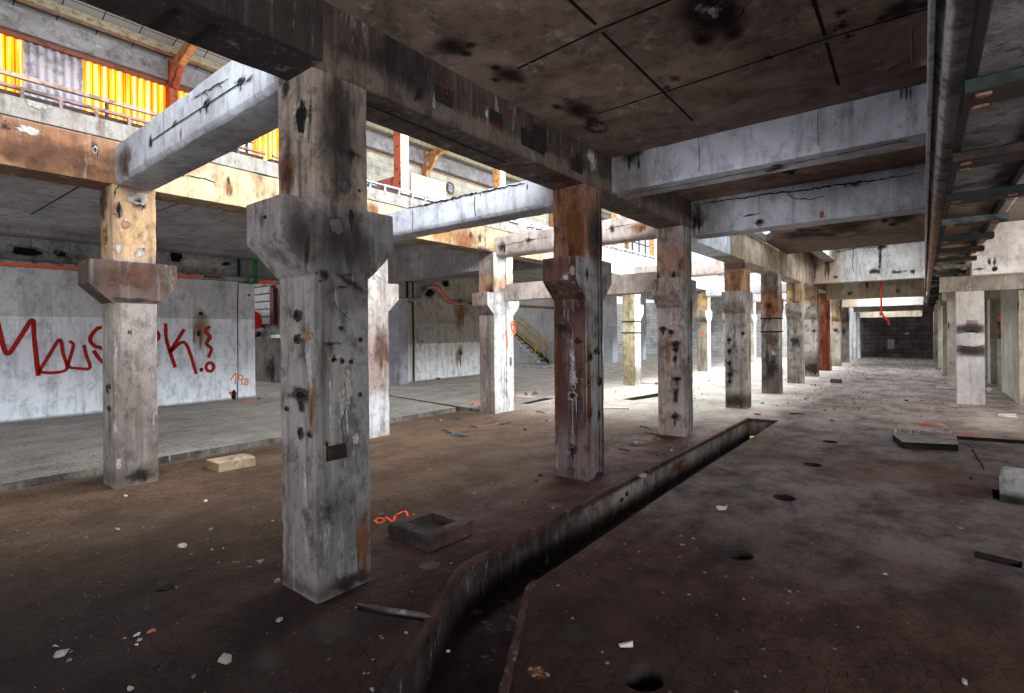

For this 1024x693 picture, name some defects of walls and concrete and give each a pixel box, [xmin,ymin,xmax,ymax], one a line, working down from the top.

crack [150,79,239,142]
crack [629,117,921,205]